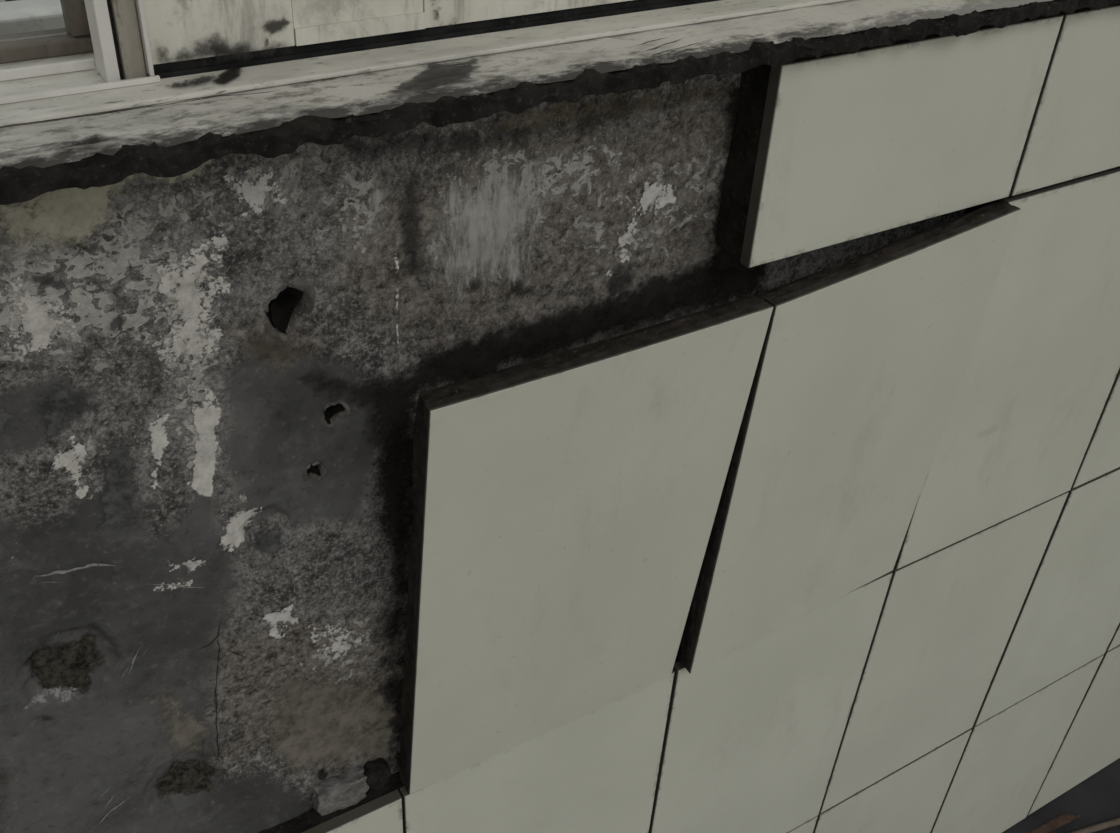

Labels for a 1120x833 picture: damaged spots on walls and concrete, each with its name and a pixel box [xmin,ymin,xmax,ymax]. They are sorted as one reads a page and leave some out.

spalling [213,63,244,83]
peeling [378,56,481,96]
flaking render [497,208,967,371]
flaking render [0,71,741,833]
water stain [303,85,767,762]